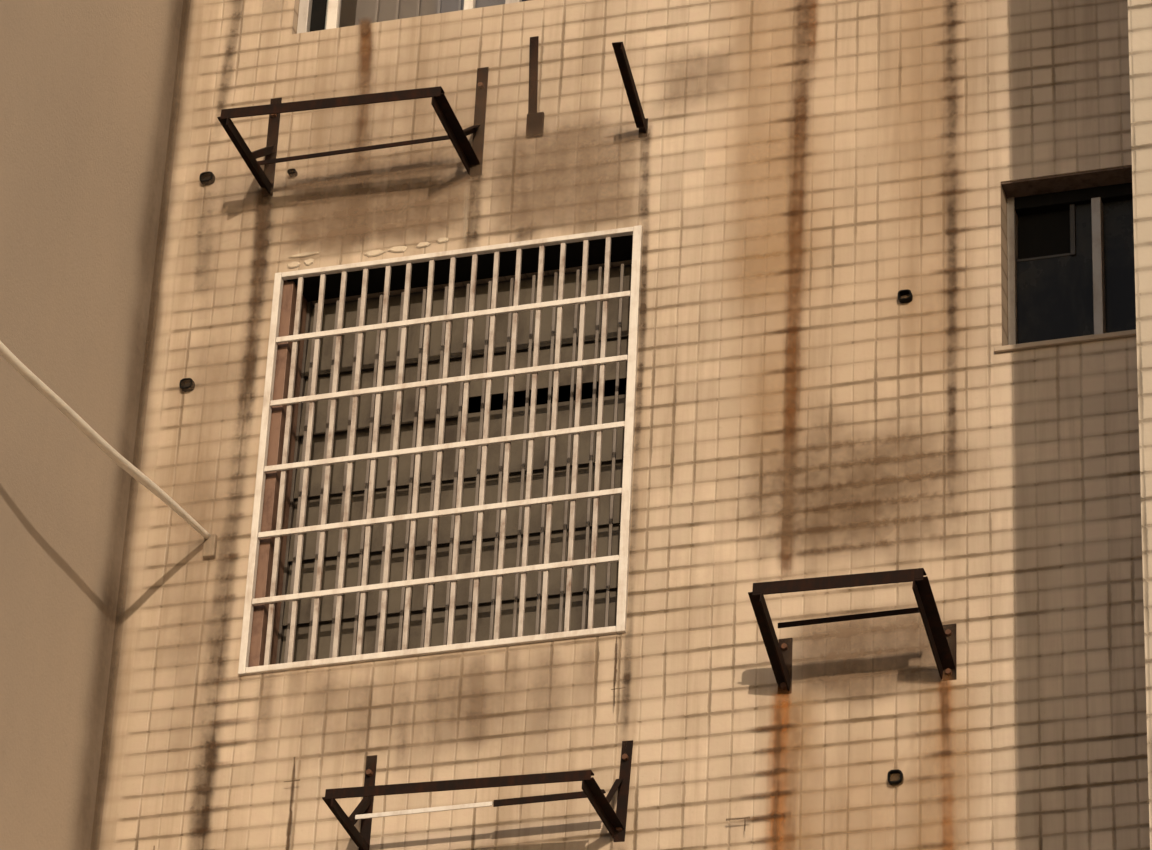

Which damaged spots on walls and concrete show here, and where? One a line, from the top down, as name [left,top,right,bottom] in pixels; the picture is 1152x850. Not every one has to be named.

damp [175,0,190,43]
damp [218,12,241,107]
corrosion [797,0,815,64]
corrosion [749,78,808,279]
damp [125,93,180,478]
corrosion [786,326,797,453]
damp [758,434,950,554]
damp [84,507,131,850]
damp [210,595,230,683]
damp [191,763,214,850]
corrosion [748,693,802,850]